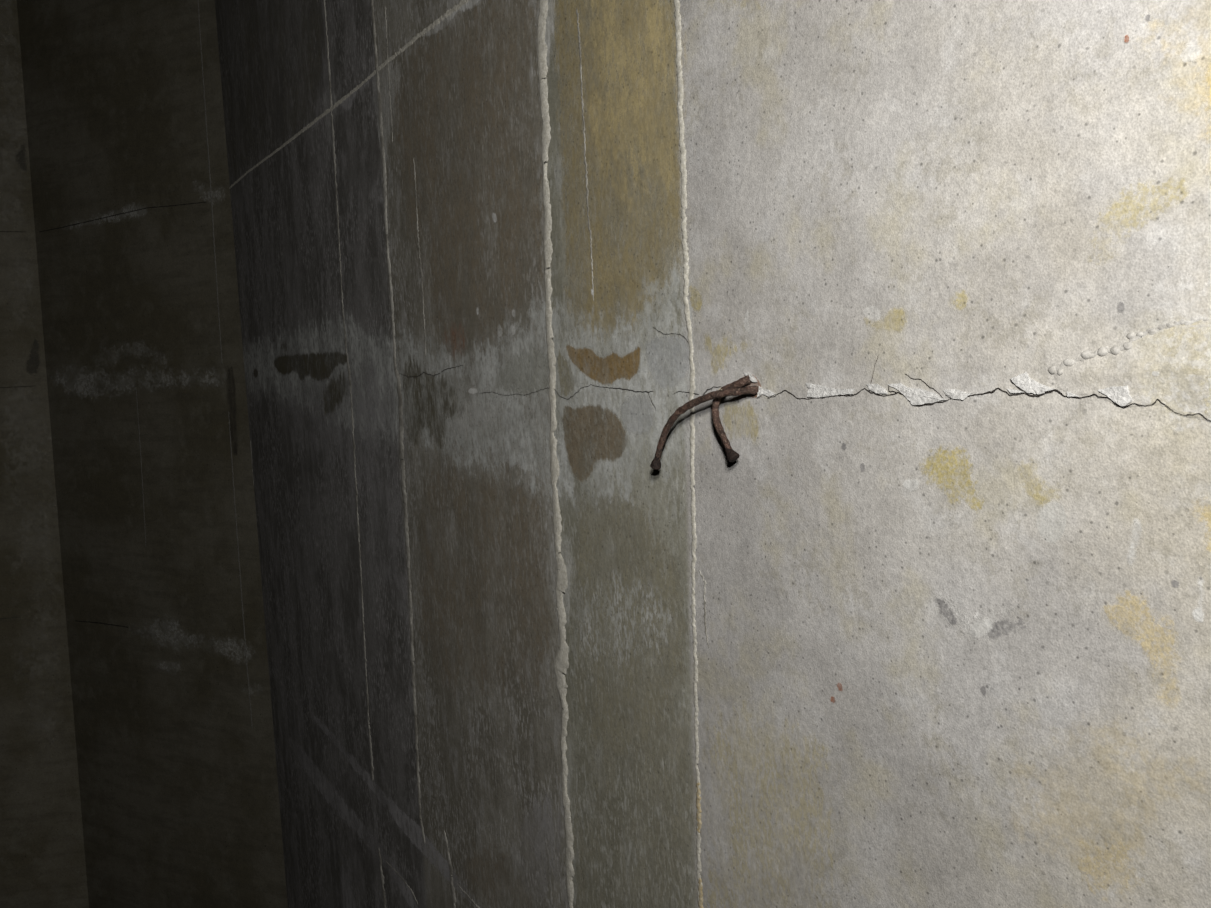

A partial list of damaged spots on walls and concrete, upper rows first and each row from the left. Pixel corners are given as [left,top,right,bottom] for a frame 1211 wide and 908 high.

water stain [1104,178,1187,227]
crack [484,384,721,409]
crack [763,358,1211,421]
water stain [197,0,737,908]